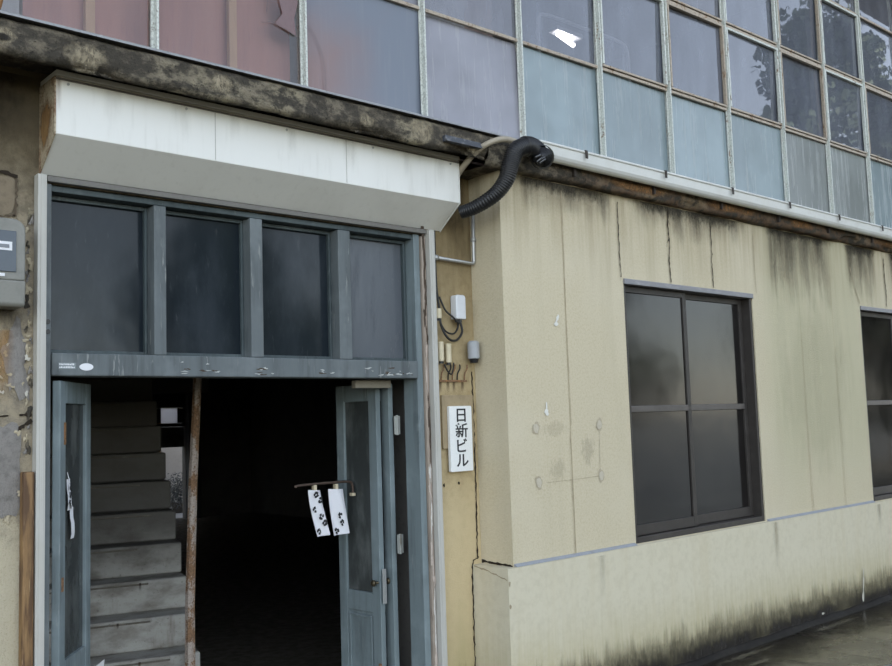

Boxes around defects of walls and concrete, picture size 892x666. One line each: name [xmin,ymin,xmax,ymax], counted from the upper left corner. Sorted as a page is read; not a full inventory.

water stain [643,202,733,225]
spalling [0,170,34,524]
water stain [605,576,892,666]